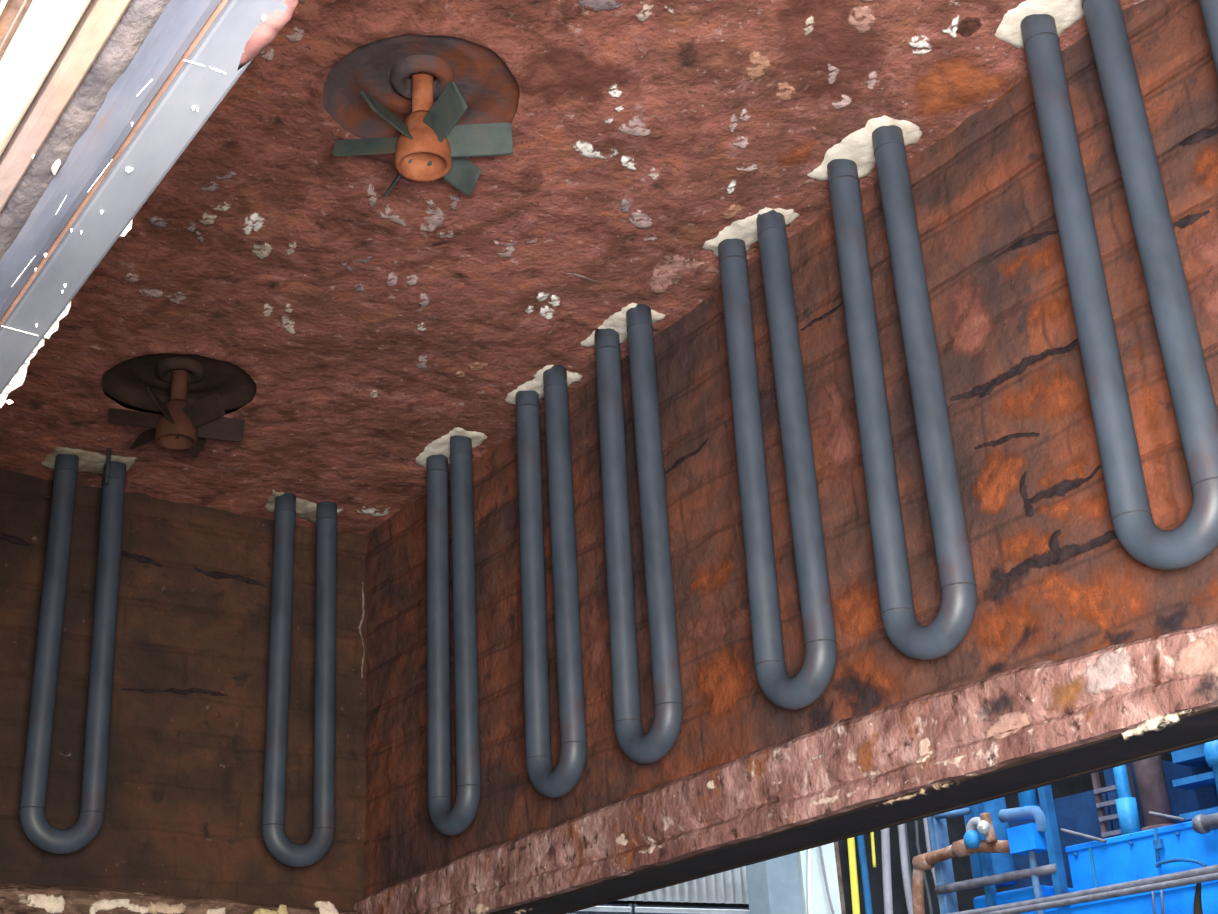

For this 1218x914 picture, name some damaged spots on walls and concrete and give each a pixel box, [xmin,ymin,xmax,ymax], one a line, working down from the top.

corrosion [915,57,1004,116]
spalling [604,85,651,137]
spalling [573,140,659,180]
crack [1173,210,1209,228]
crack [950,339,1078,401]
crack [975,432,1040,449]
corrosion [974,451,1023,512]
crack [999,465,1117,580]
spalling [27,894,65,913]
spalling [90,899,186,914]
spalling [254,904,288,914]
spalling [315,901,339,914]